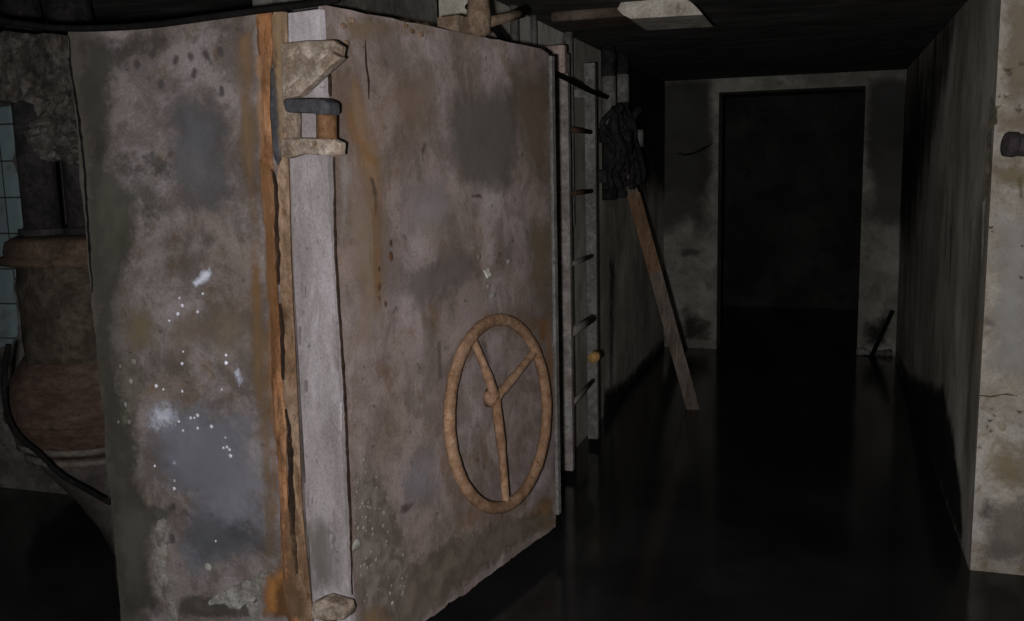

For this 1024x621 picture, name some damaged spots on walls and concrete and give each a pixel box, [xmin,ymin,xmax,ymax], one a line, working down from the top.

damp [93,97,226,611]
corrosion [260,163,277,354]
damp [152,408,258,566]
spalling [152,504,269,621]